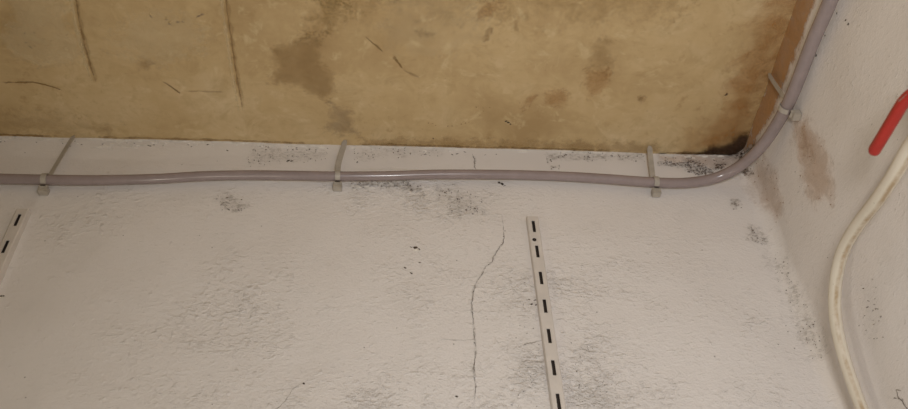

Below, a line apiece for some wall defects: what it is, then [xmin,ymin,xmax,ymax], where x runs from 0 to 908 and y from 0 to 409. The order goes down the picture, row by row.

damp [663,136,753,175]